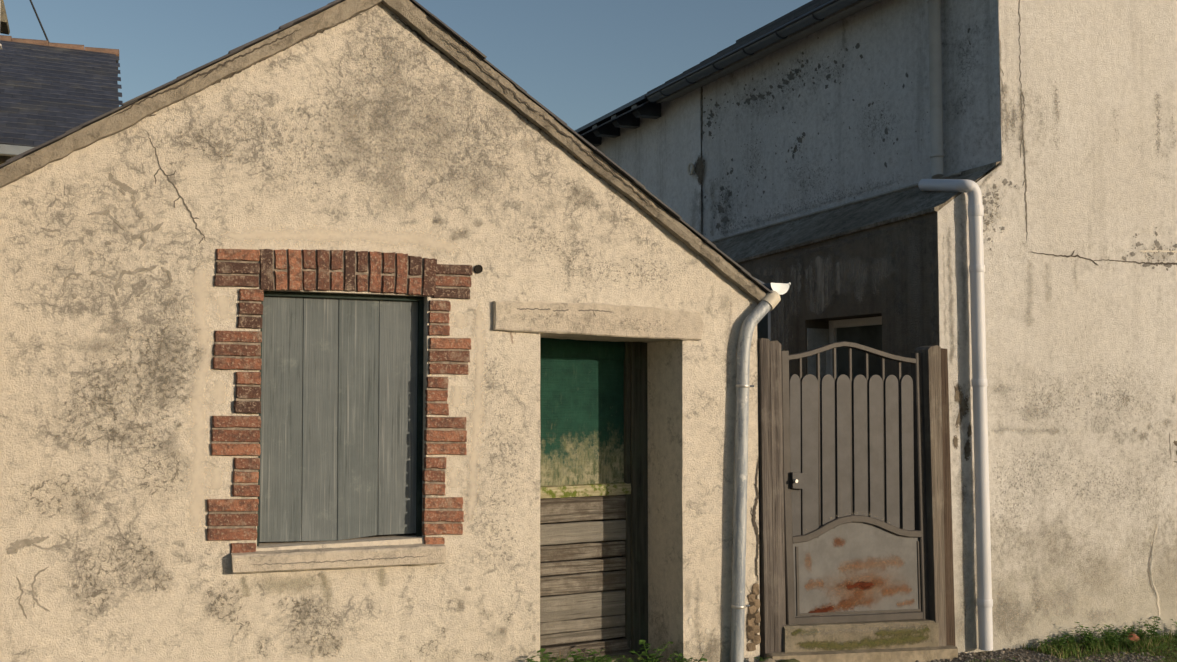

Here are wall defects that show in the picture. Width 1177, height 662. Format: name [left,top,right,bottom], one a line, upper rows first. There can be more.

crack [109,13,363,244]
crack [999,0,1177,266]
peeling [1120,227,1177,271]
spalling [953,385,972,461]
crack [16,537,172,618]
corrosion [809,580,883,616]